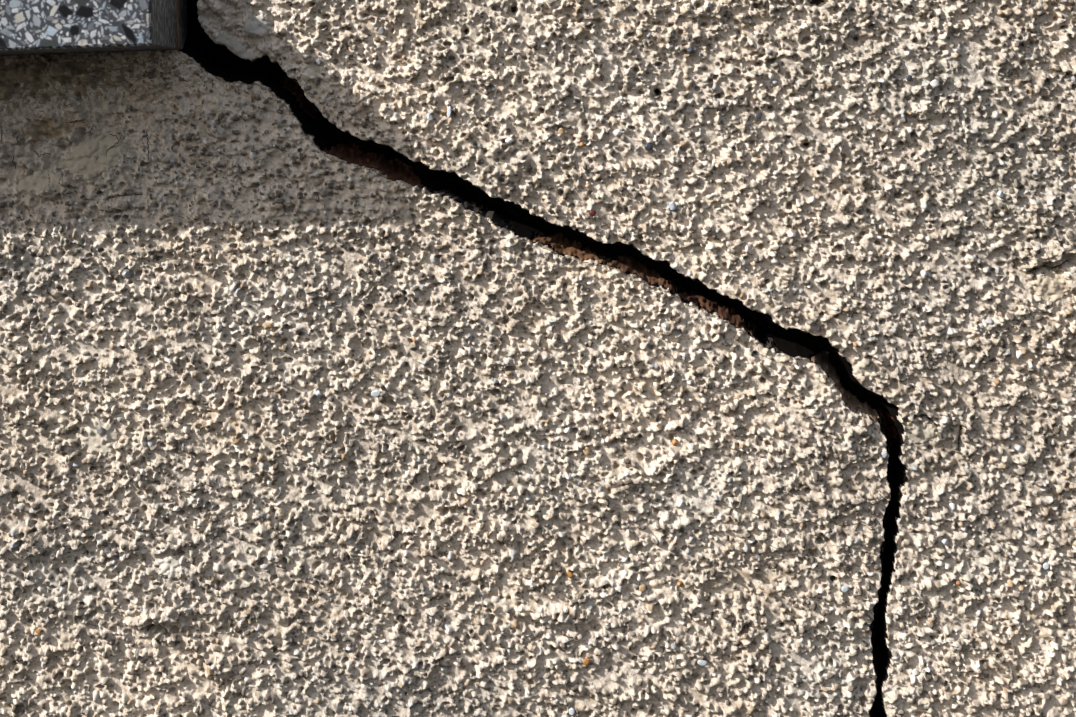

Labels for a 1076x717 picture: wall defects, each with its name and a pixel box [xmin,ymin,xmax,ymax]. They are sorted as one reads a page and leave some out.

crack [181,0,907,717]